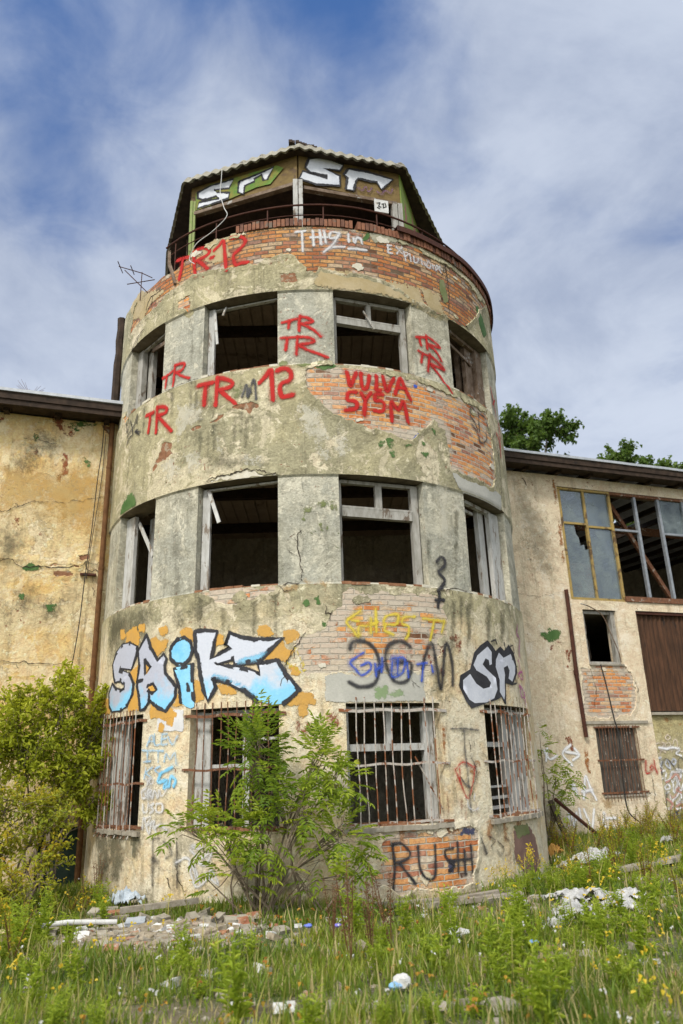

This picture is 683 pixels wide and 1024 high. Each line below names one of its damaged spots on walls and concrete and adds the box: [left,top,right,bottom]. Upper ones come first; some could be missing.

flaking render [128,227,487,342]
flaking render [279,360,502,510]
crack [277,530,303,592]
flaking render [287,586,453,703]
flaking render [578,662,640,721]
flaking render [364,817,483,901]